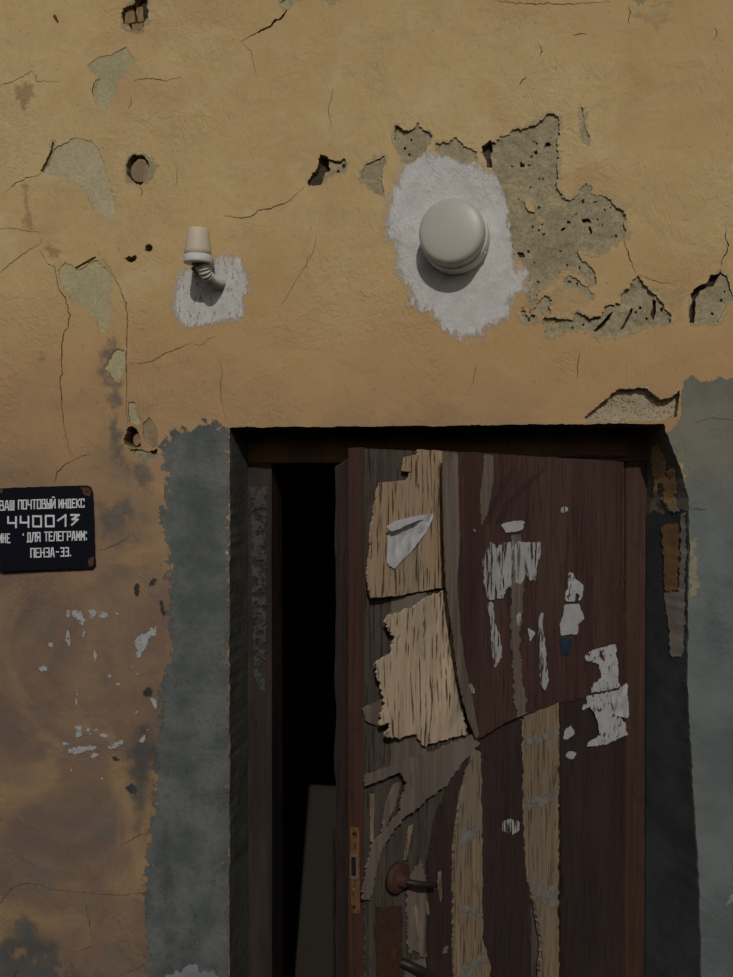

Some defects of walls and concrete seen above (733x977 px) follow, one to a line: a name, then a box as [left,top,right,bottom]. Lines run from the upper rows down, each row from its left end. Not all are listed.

spalling [121,0,149,31]
crack [495,0,631,22]
peeling [87,47,135,117]
peeling [40,137,116,219]
crack [225,189,302,219]
spalling [307,154,348,186]
spalling [357,106,674,341]
peeling [58,256,113,333]
spalling [688,269,733,327]
spalling [584,384,683,424]